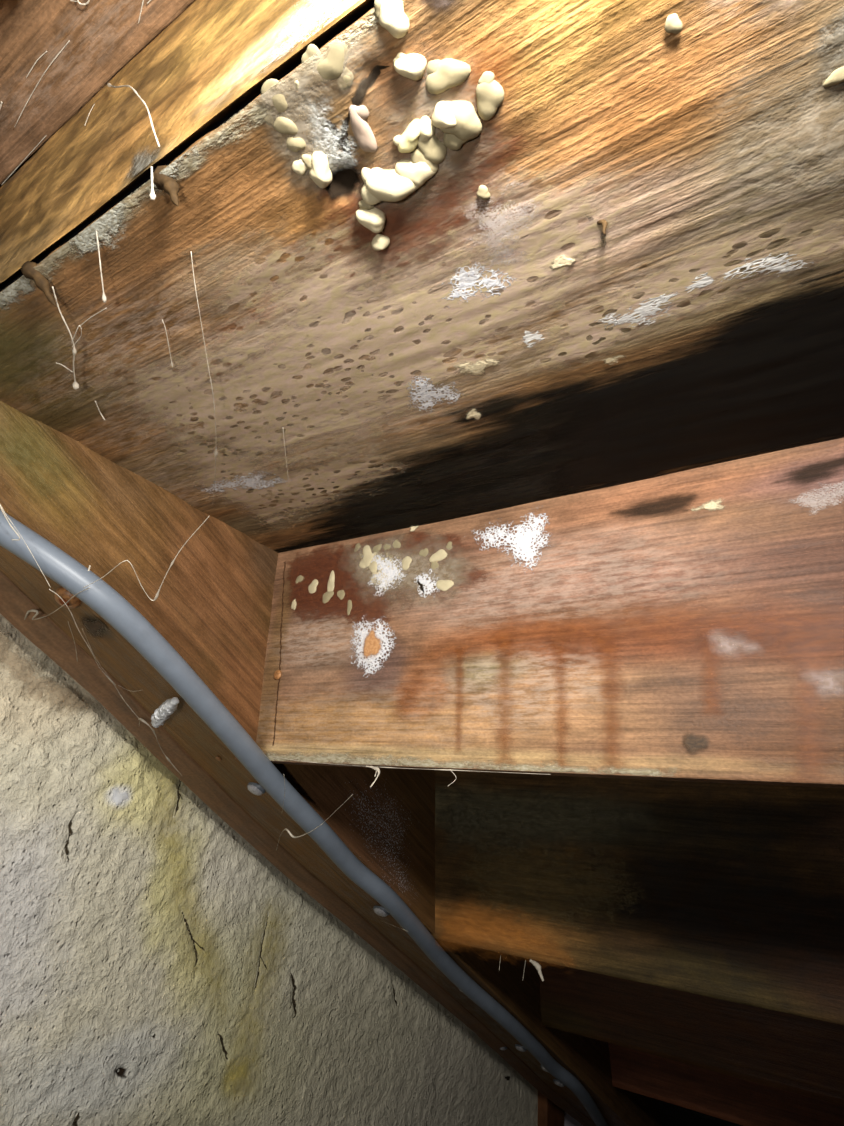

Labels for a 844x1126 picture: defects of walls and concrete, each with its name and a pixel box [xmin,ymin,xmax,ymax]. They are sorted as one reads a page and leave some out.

damp [264,53,360,176]
damp [780,16,844,180]
damp [117,92,844,678]
crack [65,813,76,862]
crack [180,907,205,976]
crack [254,918,297,1018]